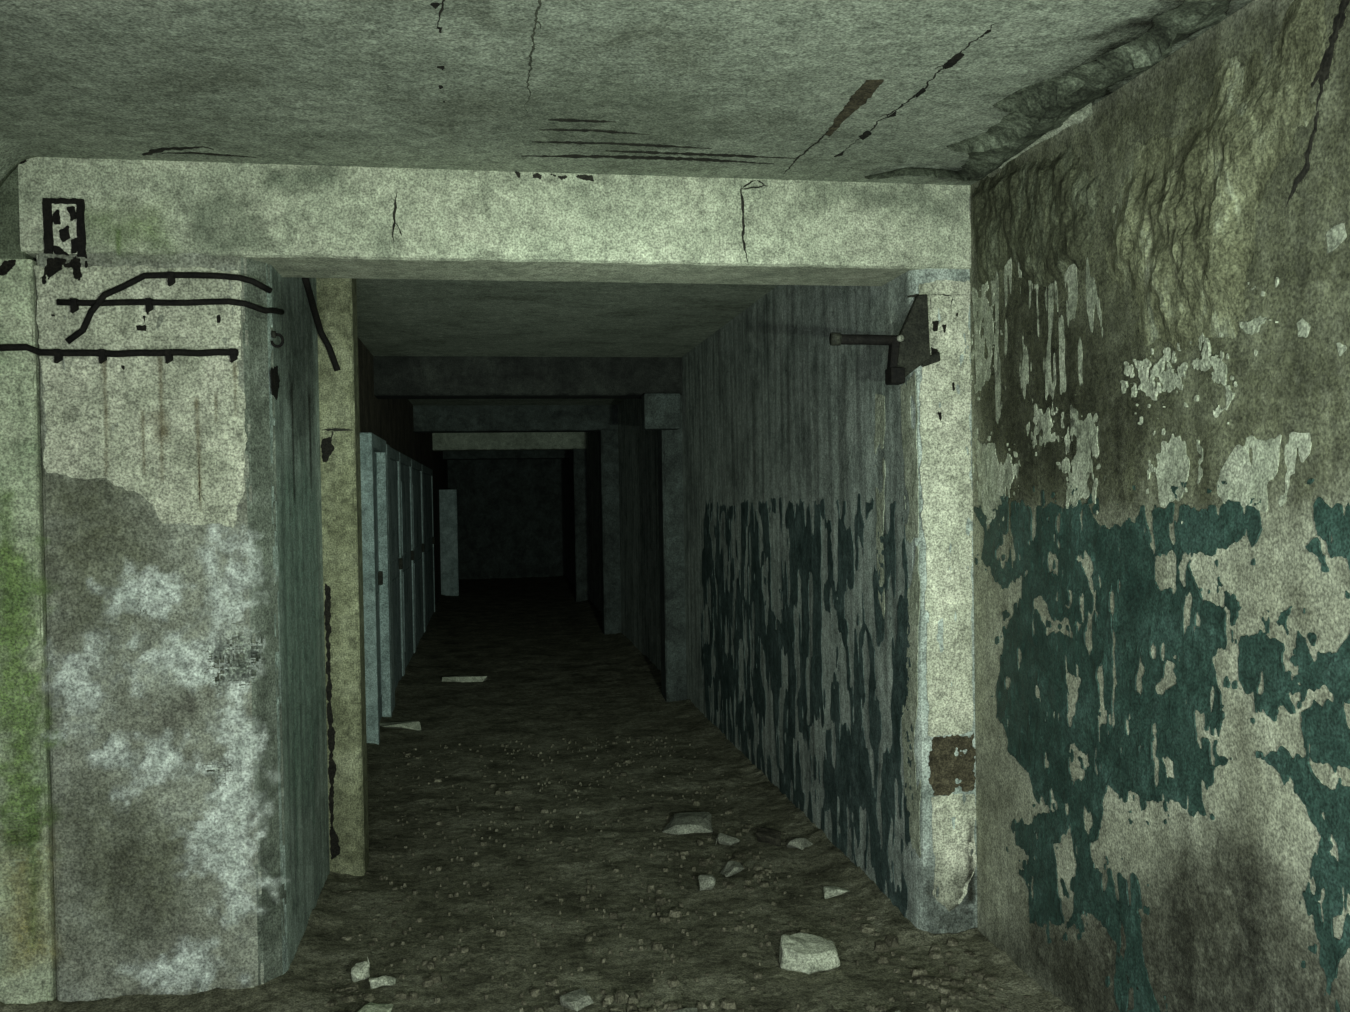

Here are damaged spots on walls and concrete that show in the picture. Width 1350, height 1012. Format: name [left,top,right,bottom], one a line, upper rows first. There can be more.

spalling [944,53,964,69]
peeling [1096,23,1178,70]
crack [521,0,996,262]
peeling [946,76,1093,169]
crack [1286,0,1350,206]
peeling [865,167,970,181]
peeling [1326,223,1347,253]
damp [53,633,104,713]
peeling [701,257,1350,1012]
damp [88,524,273,923]
damp [125,941,216,993]